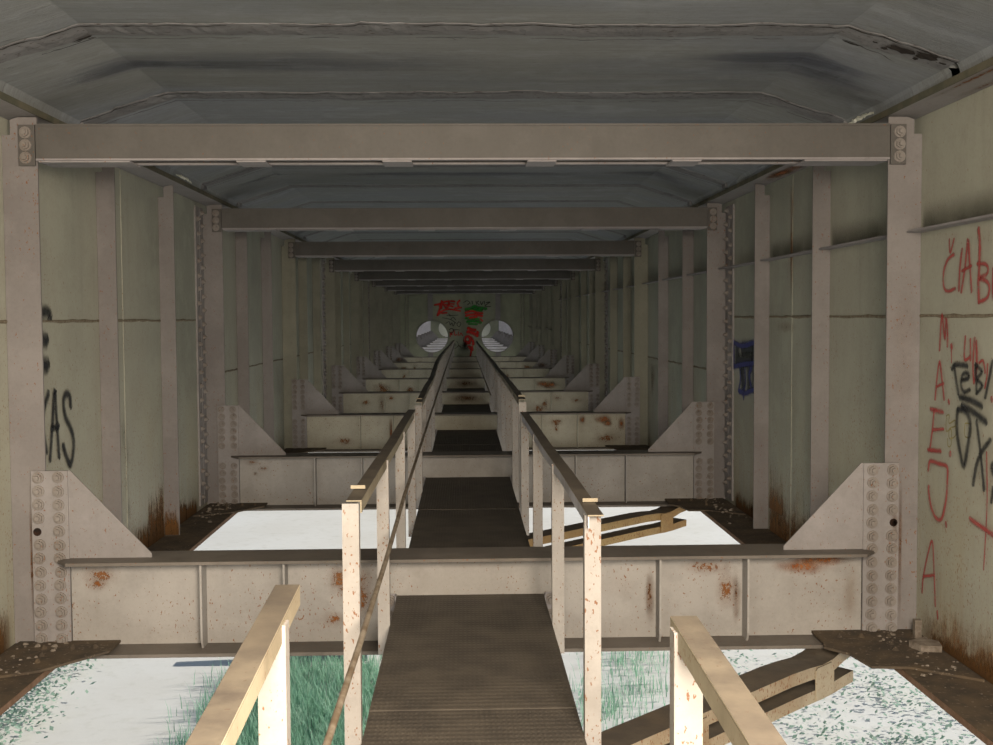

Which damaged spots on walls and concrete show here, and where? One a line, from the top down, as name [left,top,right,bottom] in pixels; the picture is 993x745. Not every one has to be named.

spalling [833,37,946,65]
rust [138,491,197,548]
rust [769,489,805,542]
rust [791,558,838,570]
rust [930,620,993,684]